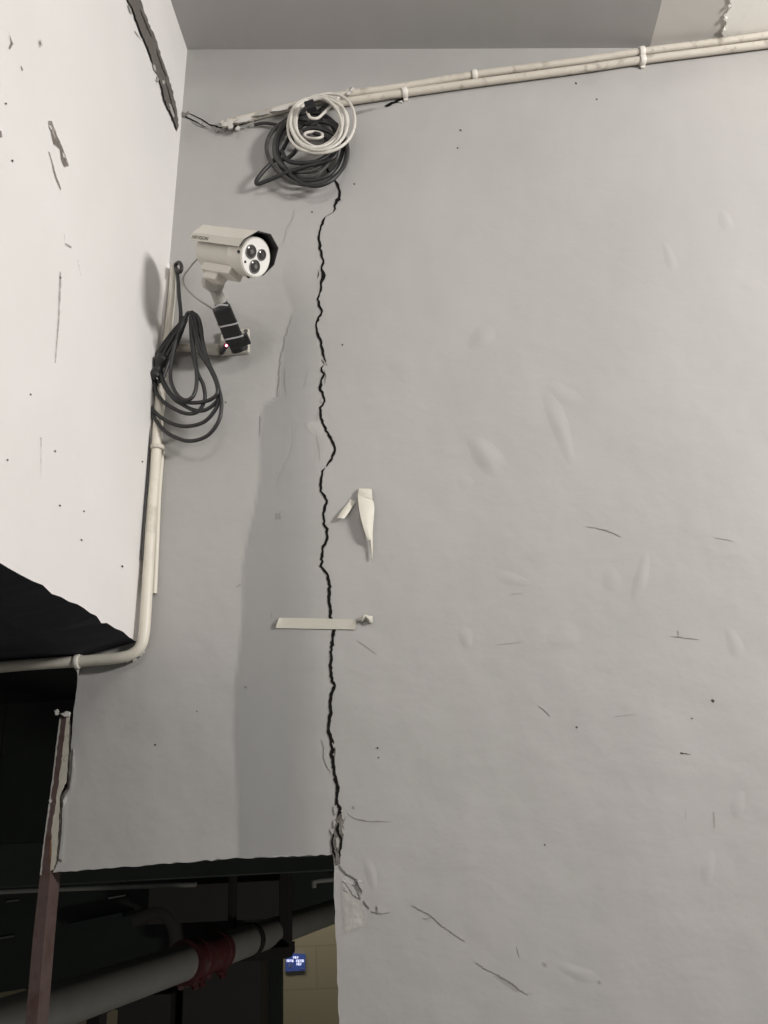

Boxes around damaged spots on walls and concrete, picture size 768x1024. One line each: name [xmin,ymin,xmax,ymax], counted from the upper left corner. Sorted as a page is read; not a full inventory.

crack [277,165,391,822]
peeling [330,805,389,931]